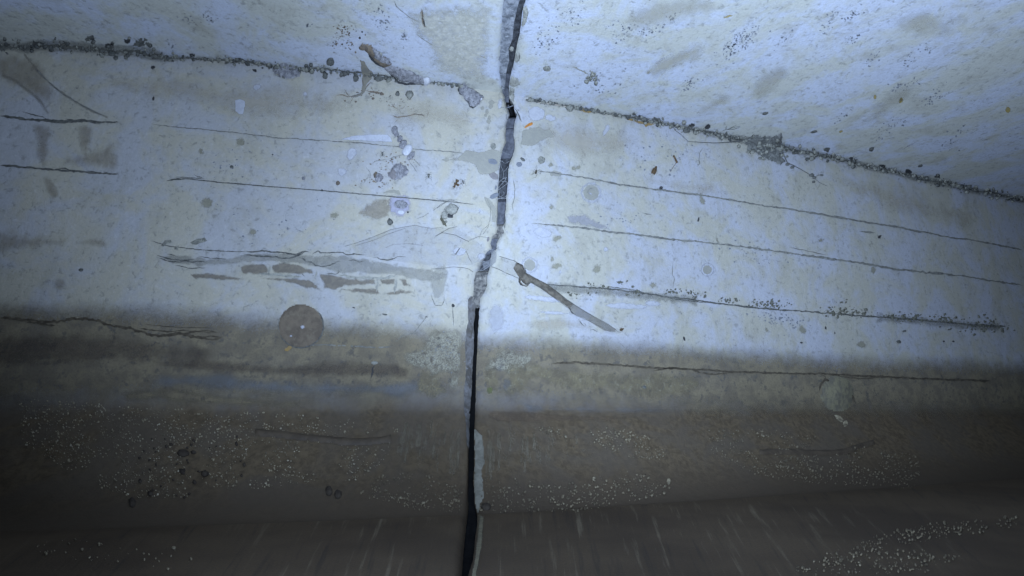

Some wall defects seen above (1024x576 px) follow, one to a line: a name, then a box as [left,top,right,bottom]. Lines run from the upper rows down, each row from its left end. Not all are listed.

crack [540,171,1021,250]
crack [2,316,222,341]
crack [153,241,245,252]
spalling [192,263,407,294]
water stain [0,310,1024,409]
crack [553,361,989,383]
crack [535,223,1020,285]
crack [548,267,1016,336]